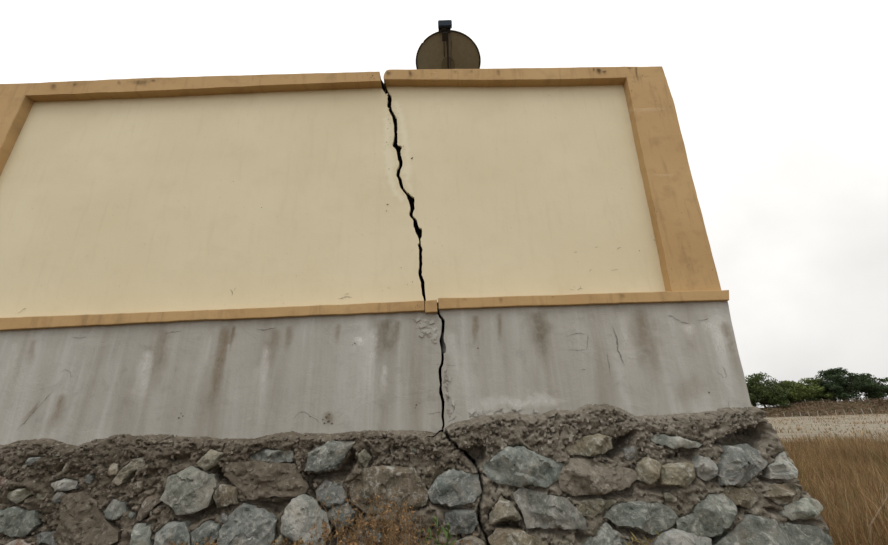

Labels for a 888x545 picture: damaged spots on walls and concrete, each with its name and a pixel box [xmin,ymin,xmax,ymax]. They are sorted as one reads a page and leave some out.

crack [381,80,446,438]